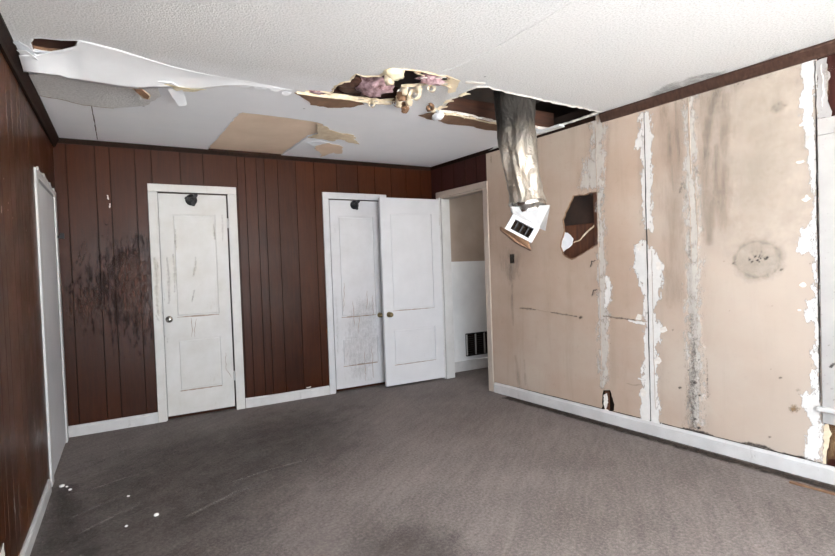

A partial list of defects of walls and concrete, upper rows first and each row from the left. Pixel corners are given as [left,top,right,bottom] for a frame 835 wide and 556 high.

peeling [13,40,291,106]
peeling [803,57,832,119]
peeling [306,124,359,157]
spalling [560,192,598,260]